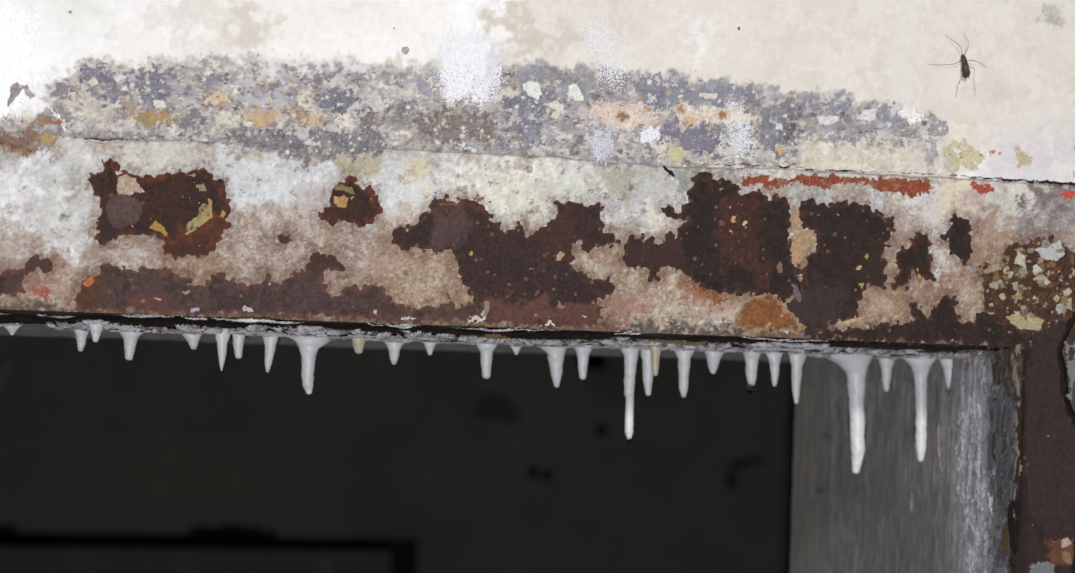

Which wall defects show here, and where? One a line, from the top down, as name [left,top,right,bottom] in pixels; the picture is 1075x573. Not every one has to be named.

spalling [7,82,35,107]
spalling [51,62,584,165]
spalling [632,72,953,171]
corrosion [0,254,53,301]
corrosion [74,158,1075,573]
peeling [1064,341,1075,402]
water stain [37,311,996,573]
peeling [985,344,1024,519]
peeling [1029,537,1072,573]